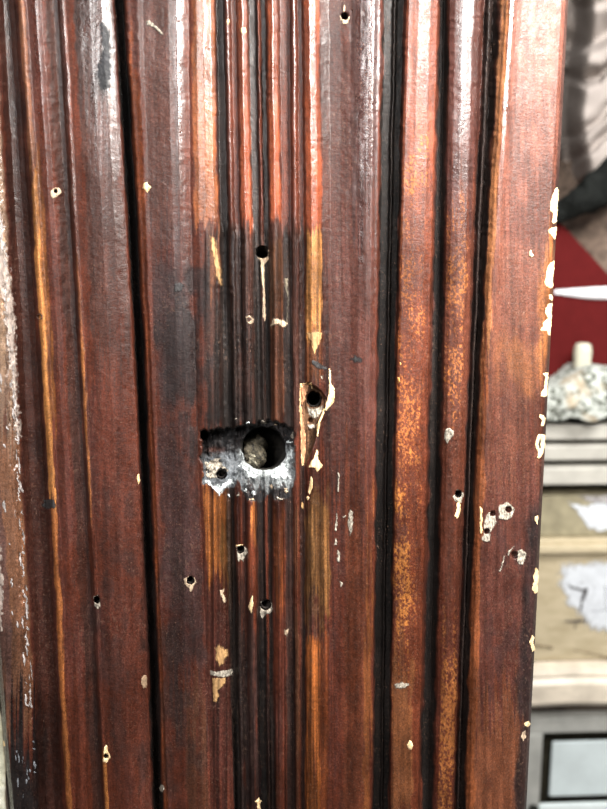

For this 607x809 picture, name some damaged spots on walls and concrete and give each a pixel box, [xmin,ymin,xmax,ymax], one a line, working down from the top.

peeling [312,360,335,411]
peeling [535,434,545,458]
spalling [480,502,515,542]
spalling [499,548,526,572]